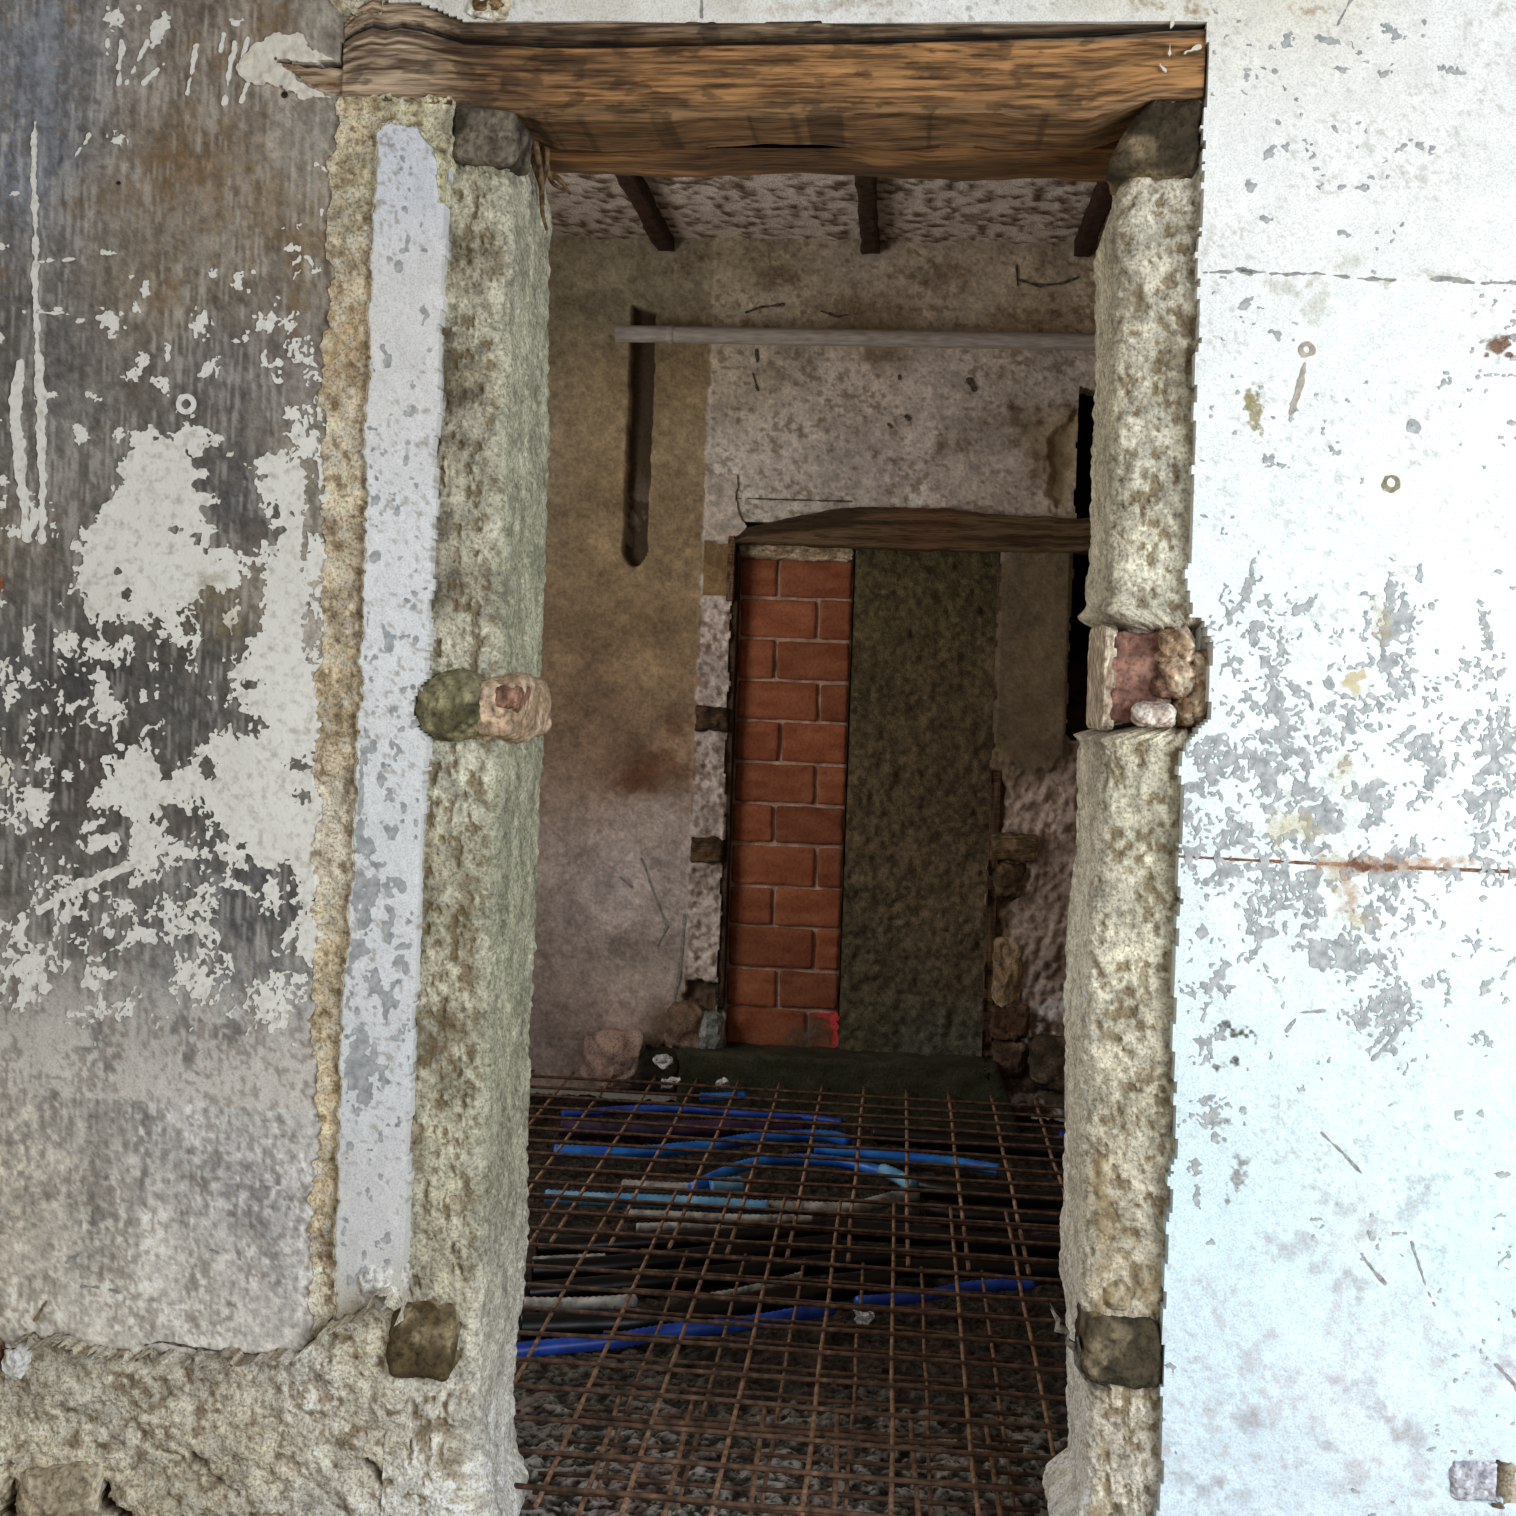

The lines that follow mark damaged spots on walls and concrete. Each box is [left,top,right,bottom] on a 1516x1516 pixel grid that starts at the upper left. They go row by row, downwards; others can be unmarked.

peeling [102,5,171,49]
peeling [1239,296,1299,342]
peeling [1439,279,1516,408]
peeling [1231,375,1299,428]
peeling [1263,453,1290,469]
peeling [0,93,456,1516]
peeling [1086,550,1516,1076]
corrosion [1320,855,1474,916]
peeling [1178,1094,1247,1144]
peeling [1455,1109,1485,1121]
peeling [1186,1158,1203,1210]
peeling [1361,1214,1407,1261]